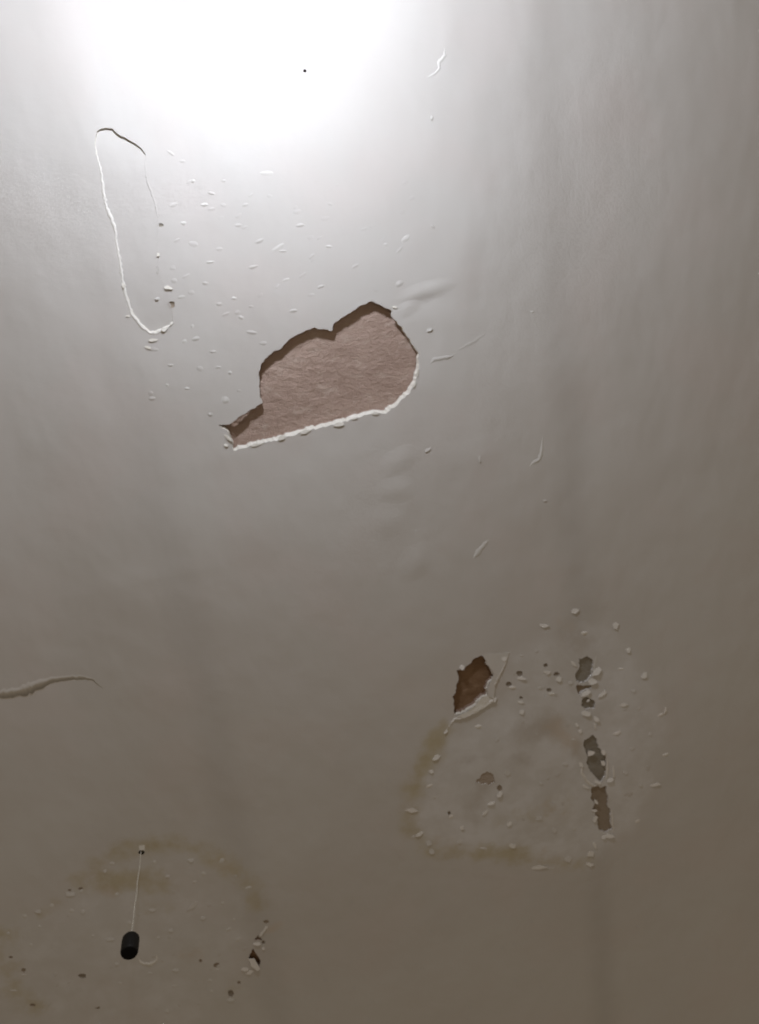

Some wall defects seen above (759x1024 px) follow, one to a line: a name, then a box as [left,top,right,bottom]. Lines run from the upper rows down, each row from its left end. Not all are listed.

spalling [219,301,419,451]
crack [0,674,102,700]
spalling [444,652,510,734]
peeling [476,772,503,816]
leakage [382,603,681,885]
peeling [571,654,615,867]
leakage [0,821,292,1024]
spalling [241,926,268,975]